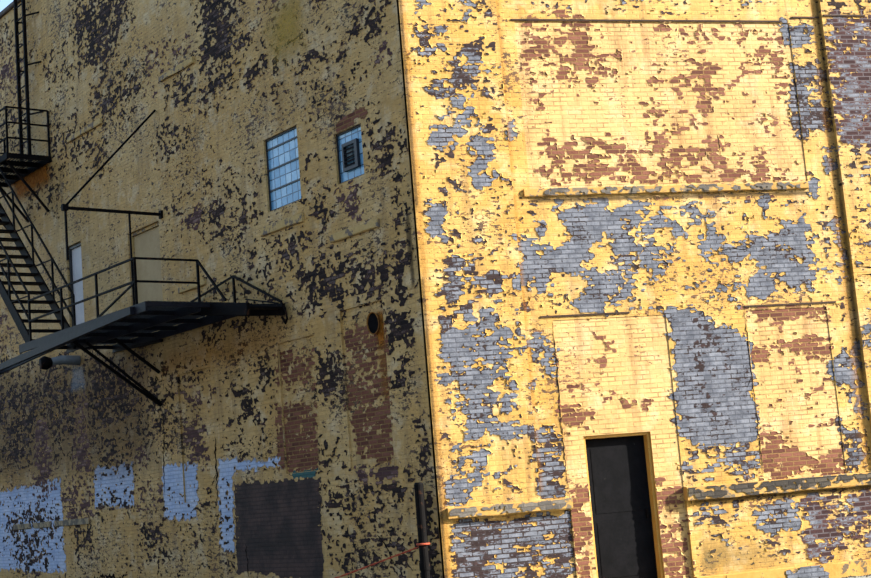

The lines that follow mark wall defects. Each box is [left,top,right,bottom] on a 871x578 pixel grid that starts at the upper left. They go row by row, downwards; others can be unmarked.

peeling [0,0,441,578]
peeling [406,0,871,578]